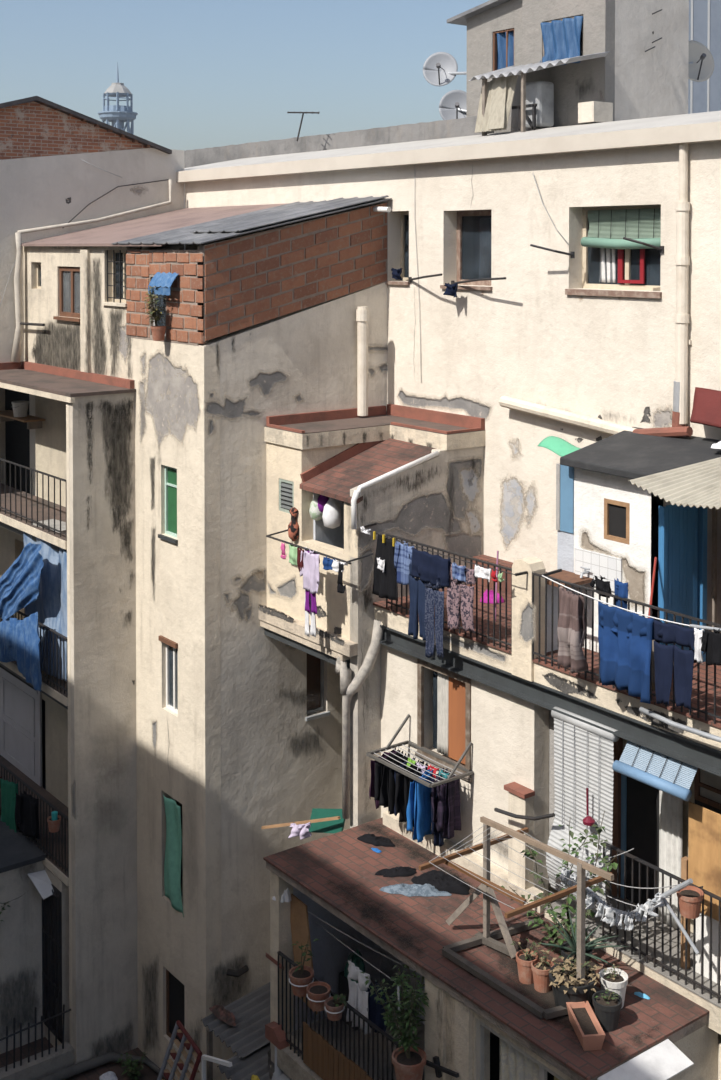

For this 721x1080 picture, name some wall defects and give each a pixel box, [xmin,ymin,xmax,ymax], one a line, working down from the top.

leakage [33,259,131,376]
peeling [139,353,287,445]
peeling [398,390,491,419]
leakage [86,401,133,557]
peeling [357,458,483,592]
peeling [501,478,537,547]
peeling [224,569,297,623]
spalling [316,605,344,646]